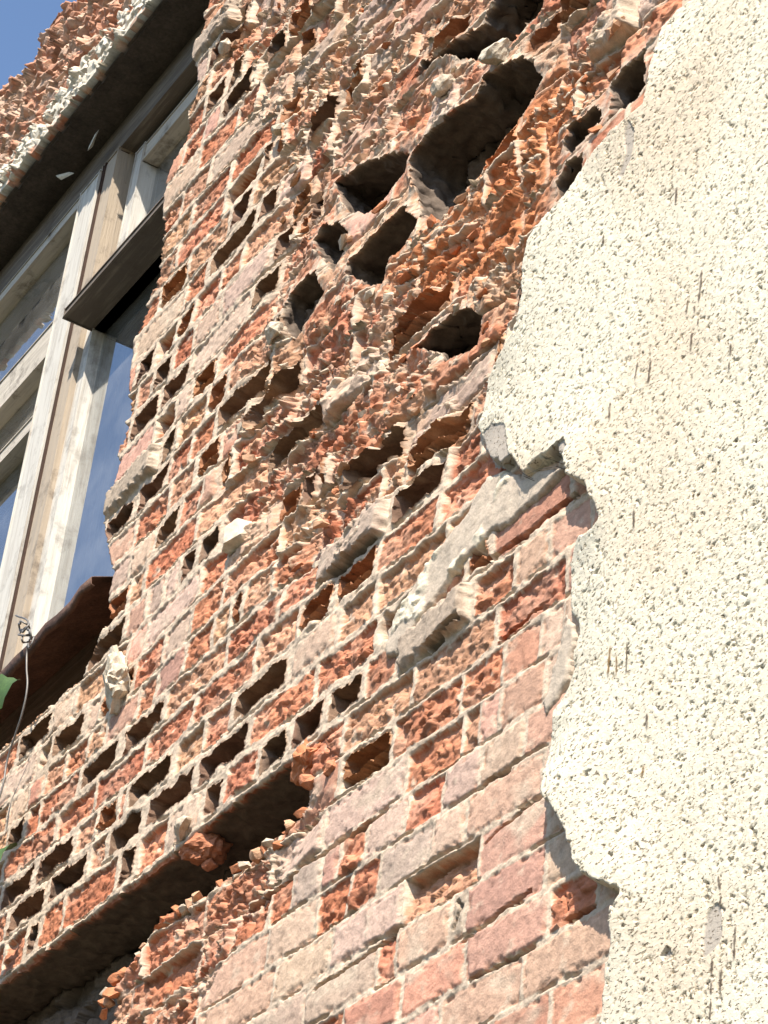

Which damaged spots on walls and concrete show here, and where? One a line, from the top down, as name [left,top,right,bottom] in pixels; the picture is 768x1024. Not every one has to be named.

spalling [88,588,128,670]
spalling [106,502,133,537]
spalling [130,0,693,1024]
spalling [3,637,257,883]
spalling [0,811,141,977]
spalling [97,799,323,1024]